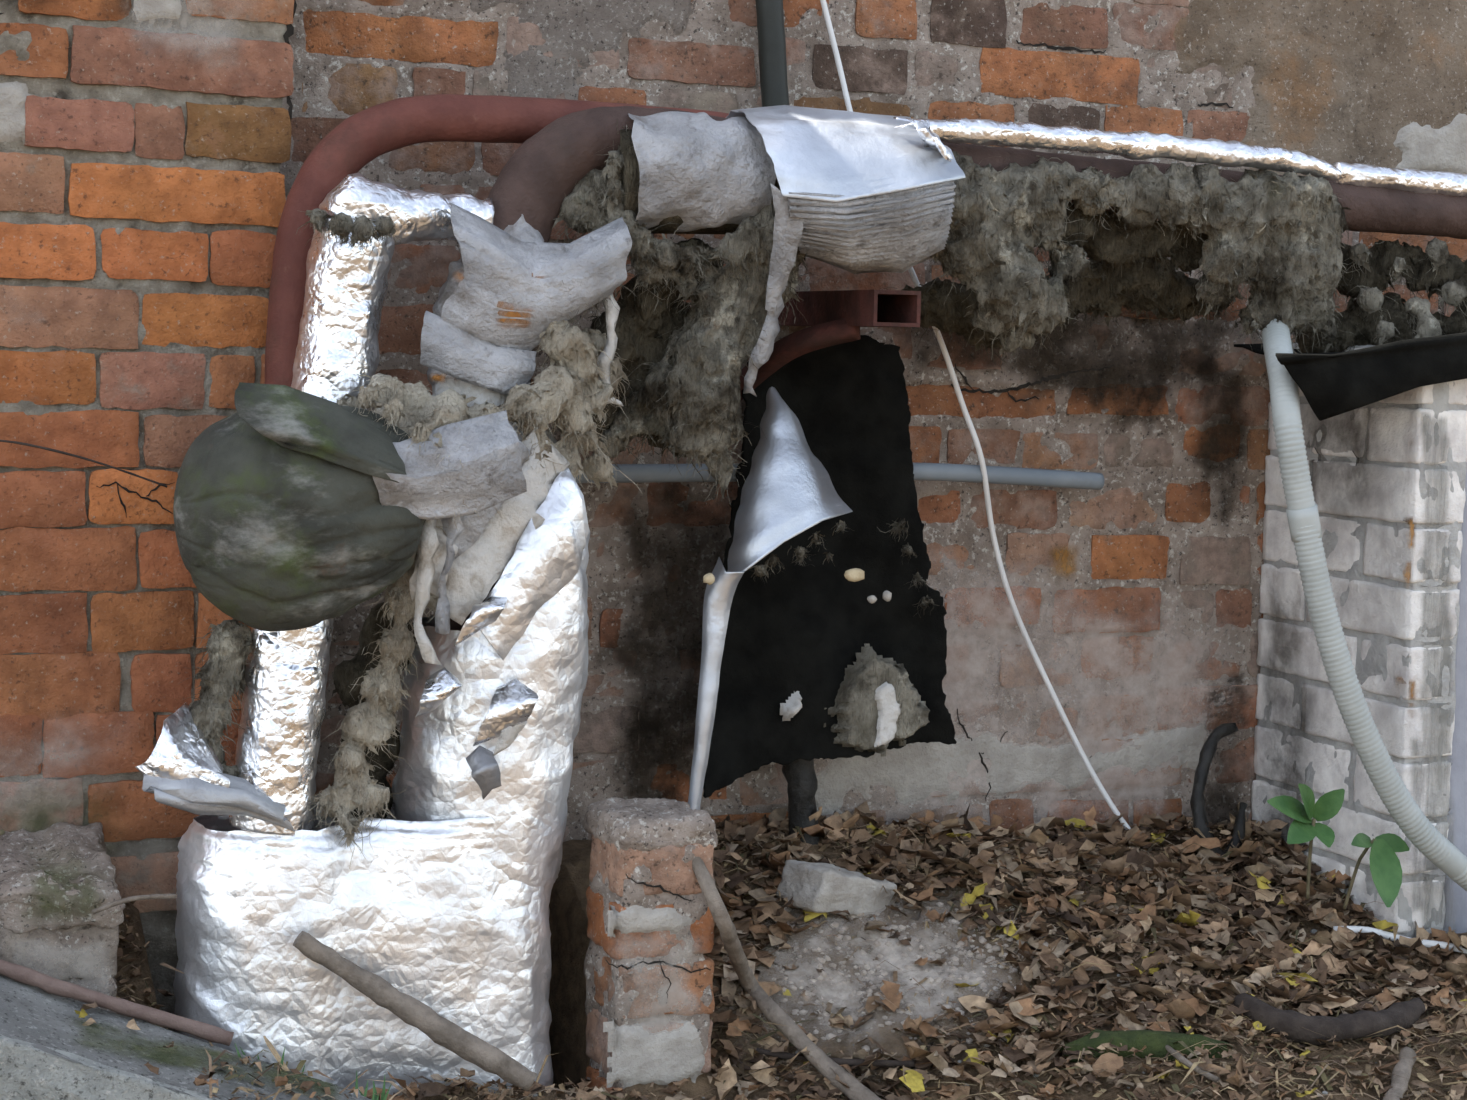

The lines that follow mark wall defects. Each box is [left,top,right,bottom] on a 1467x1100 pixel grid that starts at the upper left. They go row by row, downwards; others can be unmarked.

crack [96,481,175,518]
water stain [917,306,1246,517]